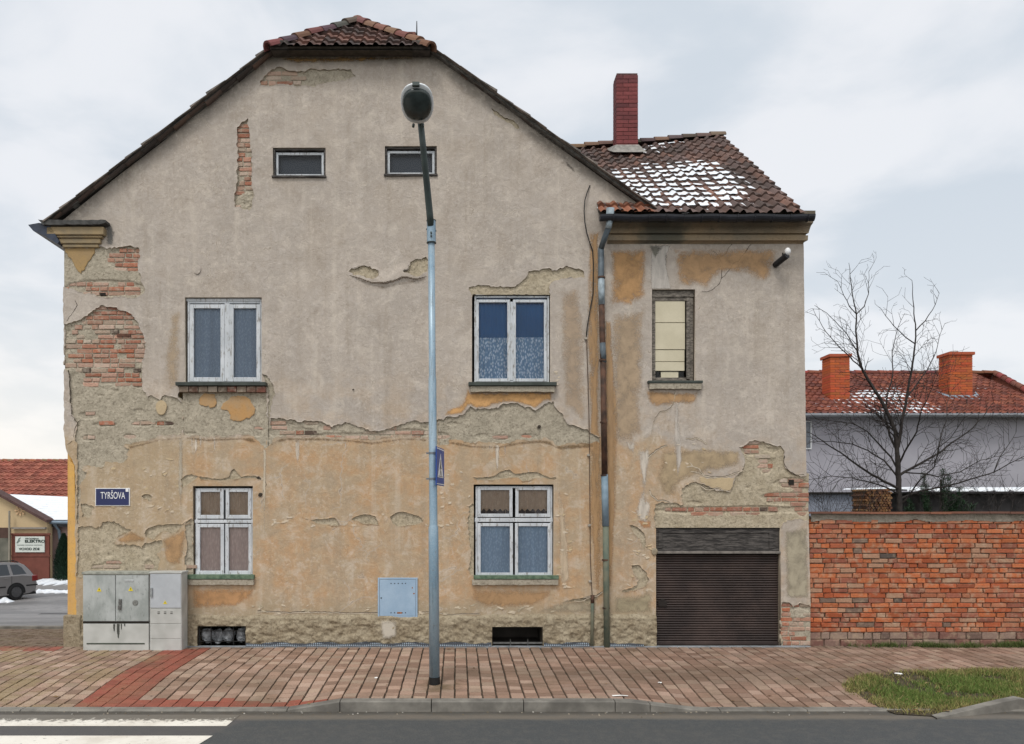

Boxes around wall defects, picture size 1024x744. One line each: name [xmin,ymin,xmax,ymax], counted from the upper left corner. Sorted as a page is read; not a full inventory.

flaking render [258,66,356,88]
flaking render [233,118,255,211]
peeling [677,250,773,285]
flaking render [64,244,601,579]
flaking render [621,439,809,593]
flaking render [780,601,811,646]